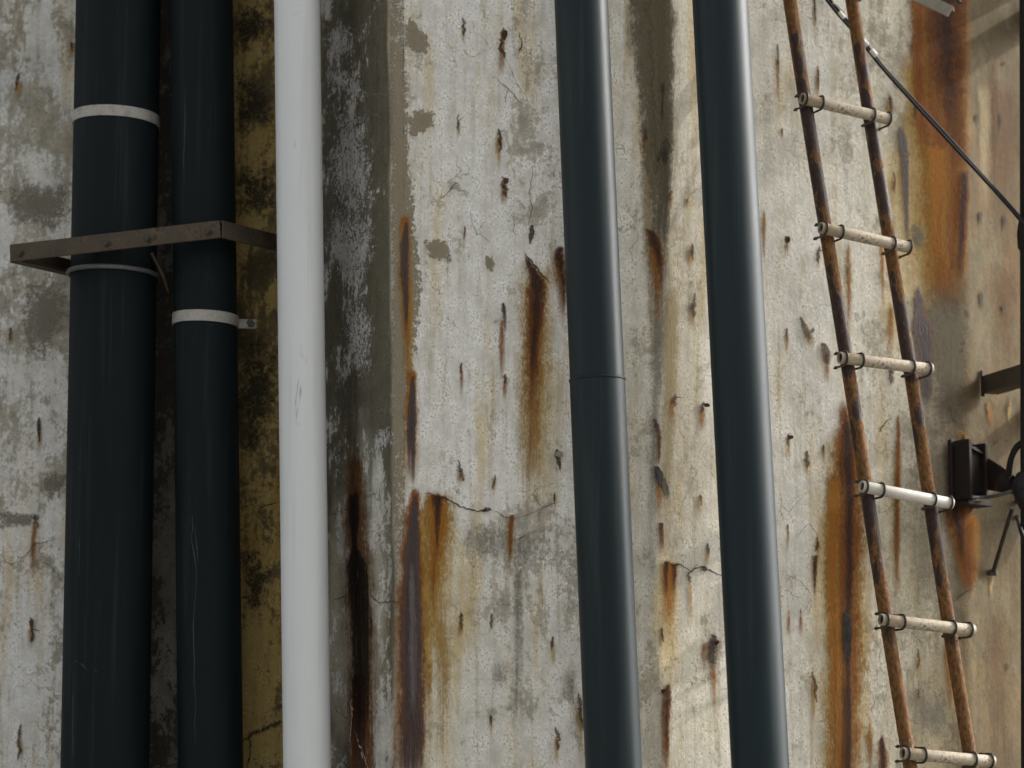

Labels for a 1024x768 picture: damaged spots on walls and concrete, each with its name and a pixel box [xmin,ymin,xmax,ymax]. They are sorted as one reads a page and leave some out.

damp [325,22,376,282]
damp [342,298,375,384]
rust [519,246,566,462]
damp [628,0,677,493]
rust [646,229,664,304]
rust [892,0,989,400]
damp [240,551,271,617]
damp [342,449,375,768]
rust [394,217,454,768]
crack [424,493,556,519]
crack [663,561,721,576]
rust [811,407,888,768]